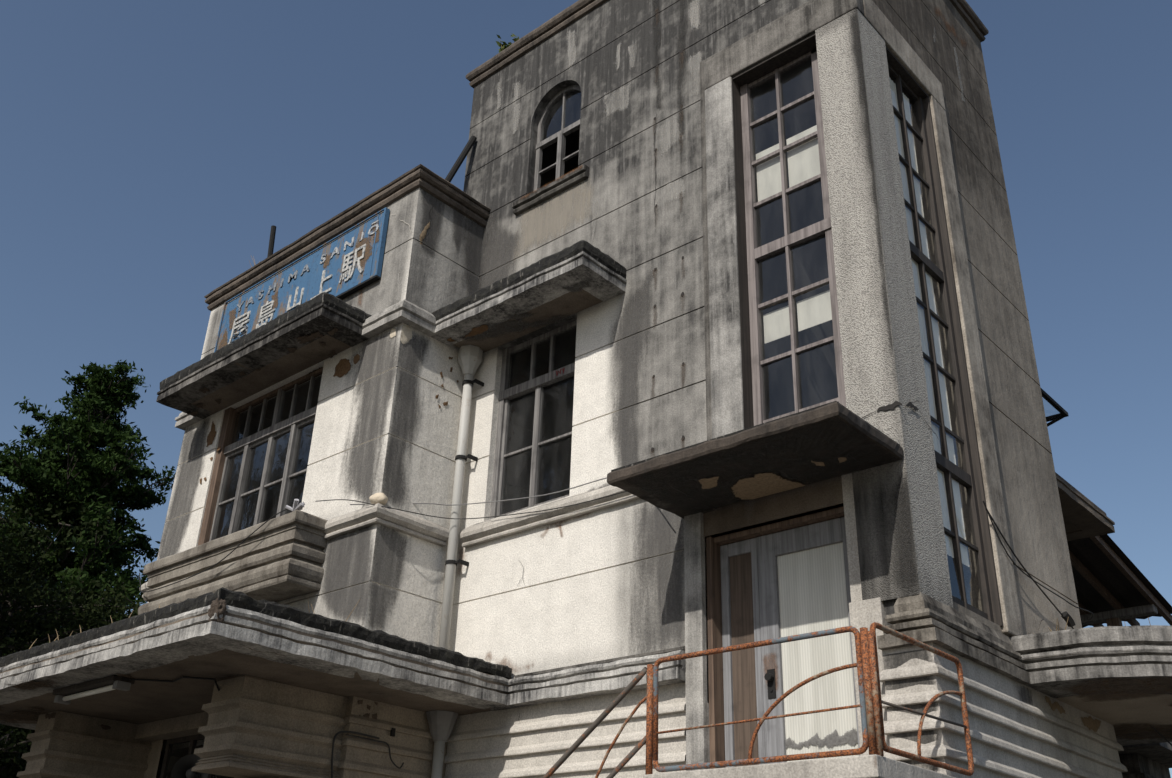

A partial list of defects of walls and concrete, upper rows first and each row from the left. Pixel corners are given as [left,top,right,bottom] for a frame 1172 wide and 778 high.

water stain [657,0,701,152]
water stain [422,184,596,295]
water stain [345,327,428,505]
peeling [698,477,719,489]
water stain [612,273,896,653]
peeling [731,473,805,500]
crack [862,400,938,438]
water stain [324,526,407,630]